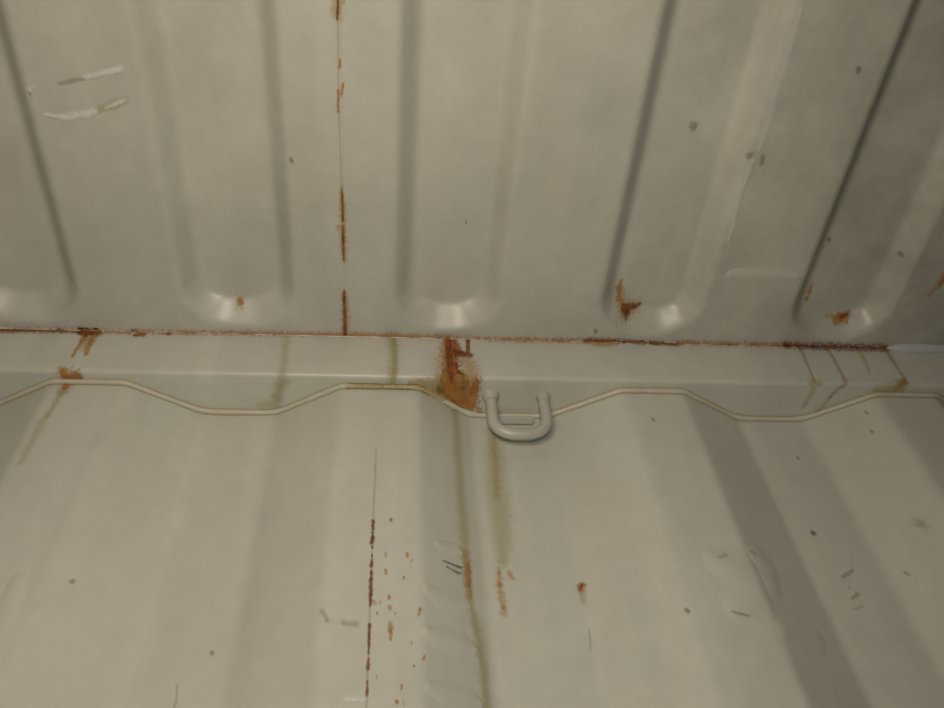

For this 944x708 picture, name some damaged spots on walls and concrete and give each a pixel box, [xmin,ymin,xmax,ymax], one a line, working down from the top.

corrosion [0,290,888,413]
corrosion [617,280,641,320]
corrosion [366,519,378,695]